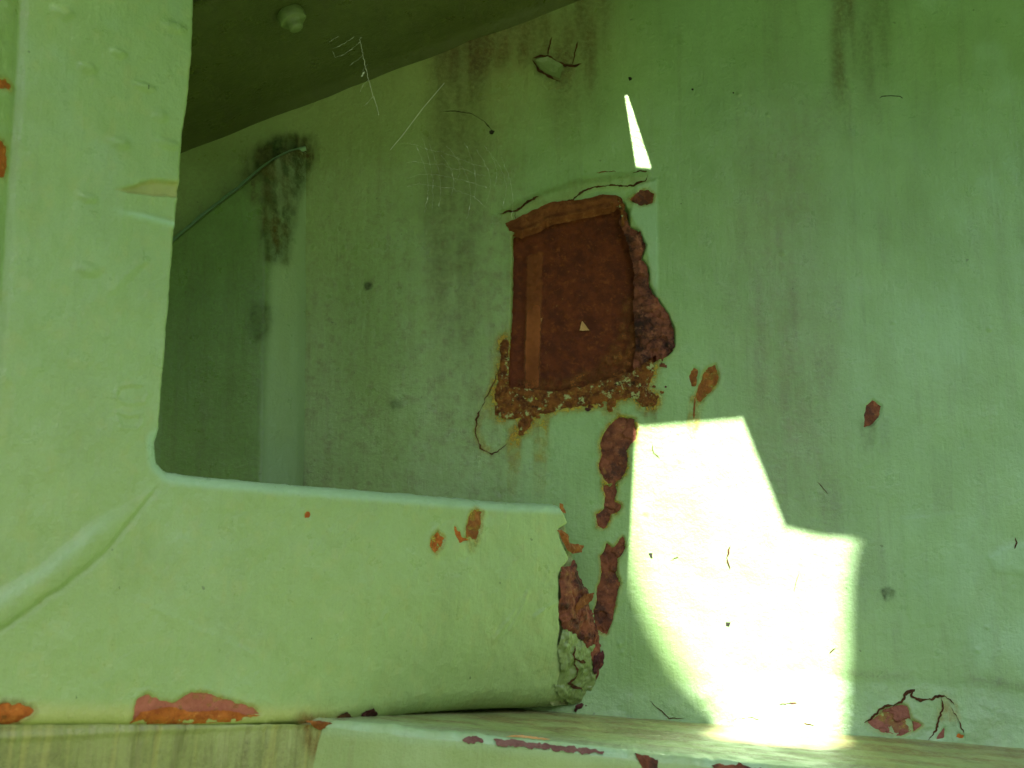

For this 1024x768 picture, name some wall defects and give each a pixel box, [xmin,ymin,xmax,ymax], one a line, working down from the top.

crack [532,38,581,81]
leakage [257,136,313,260]
crack [502,196,539,218]
crack [567,170,648,226]
rust [491,189,675,446]
crack [475,373,507,455]
peeling [689,365,719,418]
peeling [596,415,639,529]
peeling [430,509,482,553]
peeling [593,536,625,634]
peeling [129,692,260,724]
peeling [463,736,604,755]